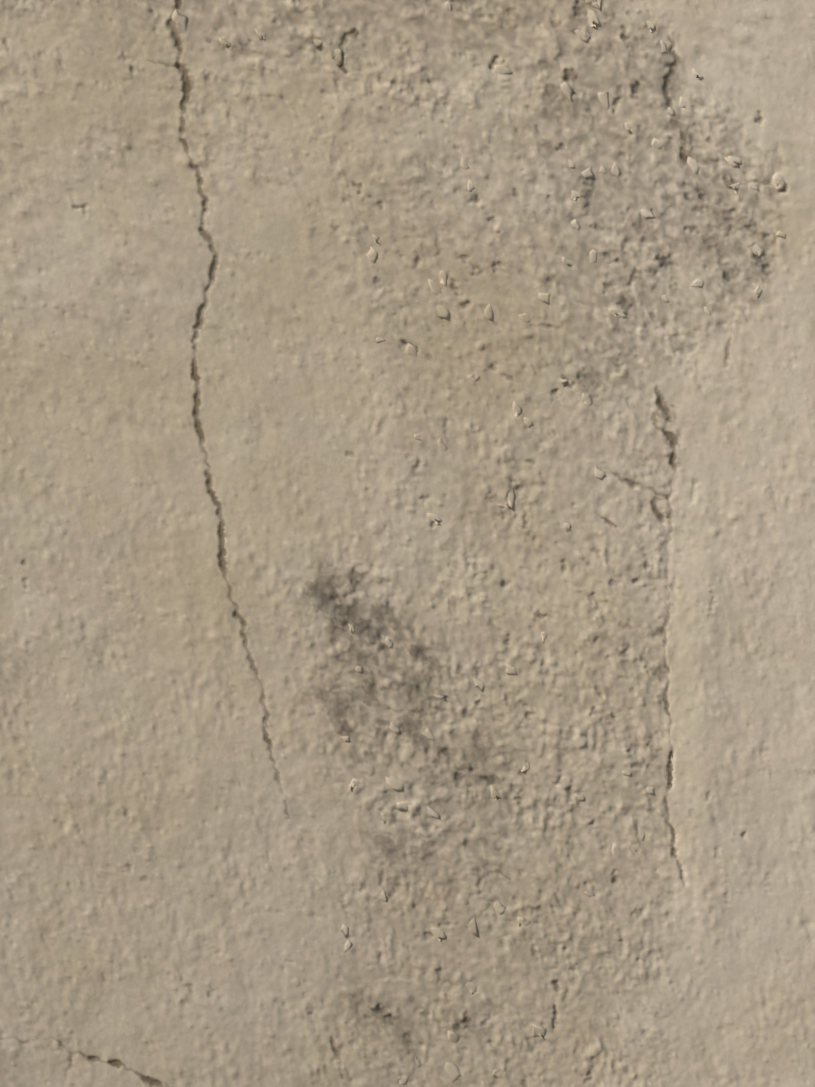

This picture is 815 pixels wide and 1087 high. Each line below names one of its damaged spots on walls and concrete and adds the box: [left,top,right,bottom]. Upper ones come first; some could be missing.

crack [175,35,191,149]
crack [191,360,204,441]
crack [206,473,226,572]